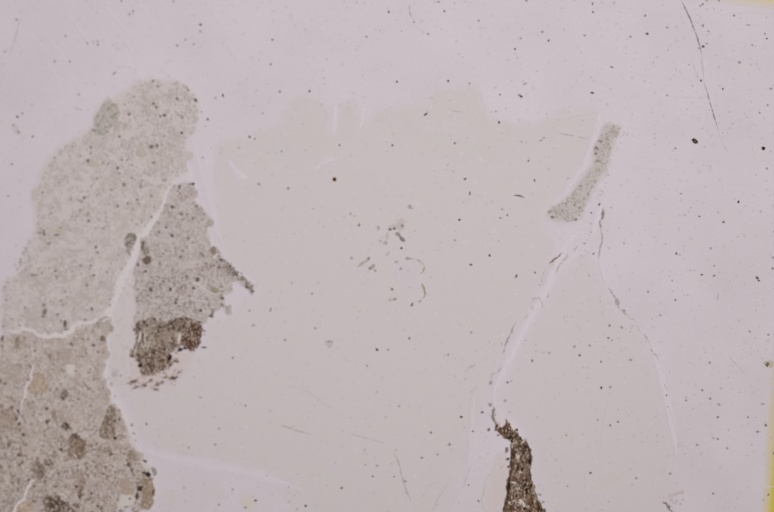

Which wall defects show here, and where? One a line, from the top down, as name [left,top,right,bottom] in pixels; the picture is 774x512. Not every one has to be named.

crack [5,179,178,450]
peeling [126,358,182,391]
crack [12,477,36,512]